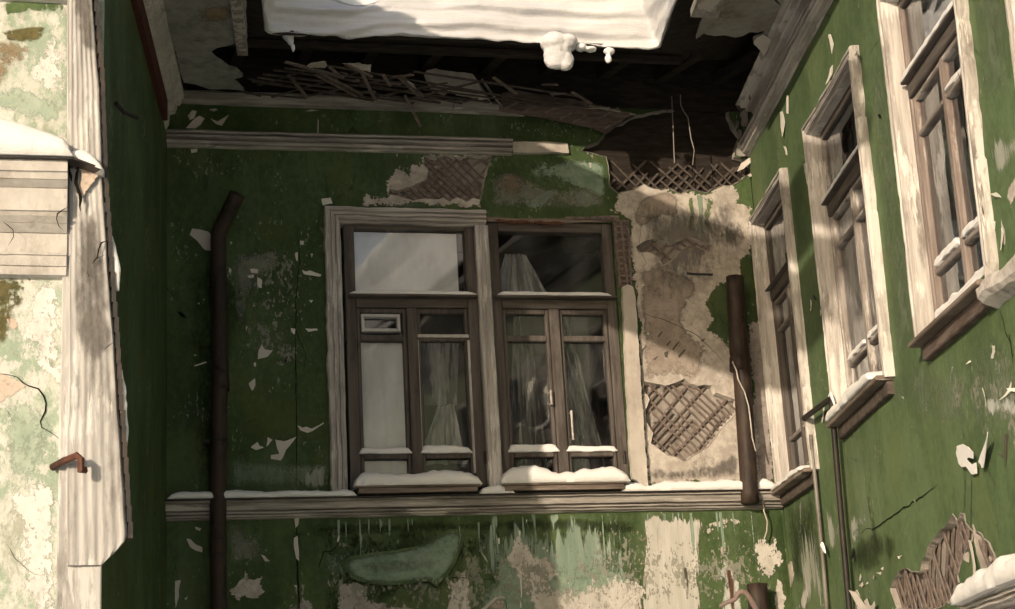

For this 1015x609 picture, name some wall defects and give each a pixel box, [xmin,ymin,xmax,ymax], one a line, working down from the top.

peeling [28,36,63,90]
peeling [186,108,229,129]
spalling [735,95,752,177]
spalling [363,154,491,208]
spalling [610,184,752,485]
crack [4,374,59,439]
crack [864,487,934,530]
peeling [11,483,57,609]
peeling [330,502,822,609]
peeling [963,540,975,574]